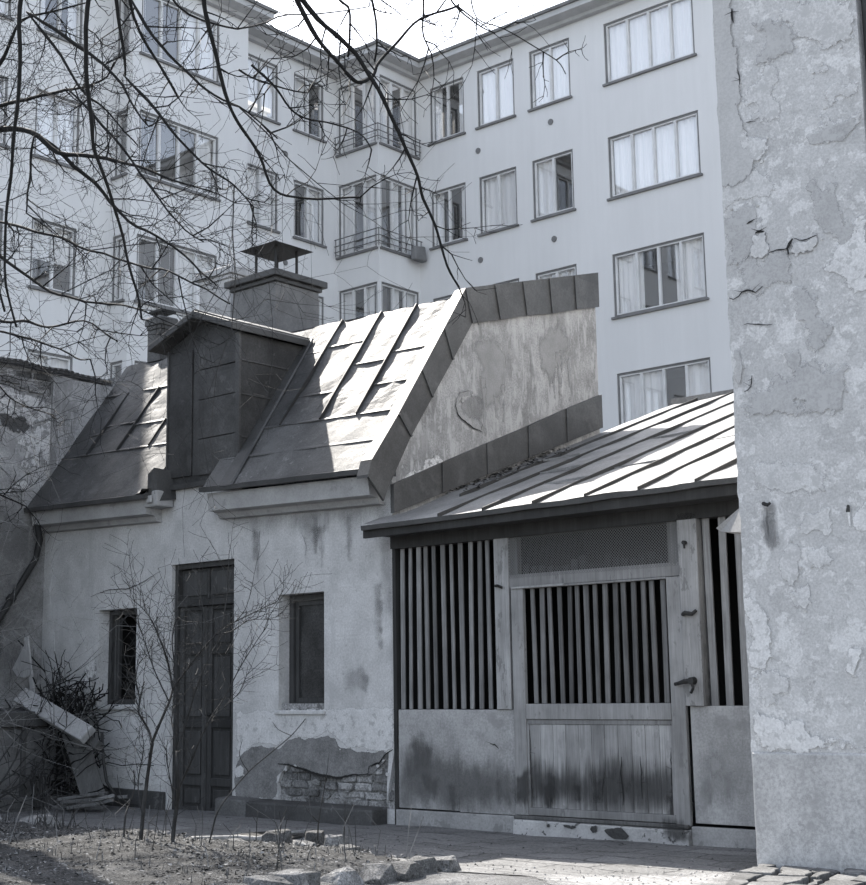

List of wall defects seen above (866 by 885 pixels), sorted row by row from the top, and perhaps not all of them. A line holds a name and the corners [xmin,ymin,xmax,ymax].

peeling [779,0,854,50]
flaking render [712,0,775,266]
peeling [806,179,866,293]
peeling [784,286,834,373]
spalling [0,362,51,495]
peeling [846,497,866,532]
peeling [744,595,773,670]
peeling [234,707,394,808]
damp [401,742,686,840]
peeling [752,712,866,754]